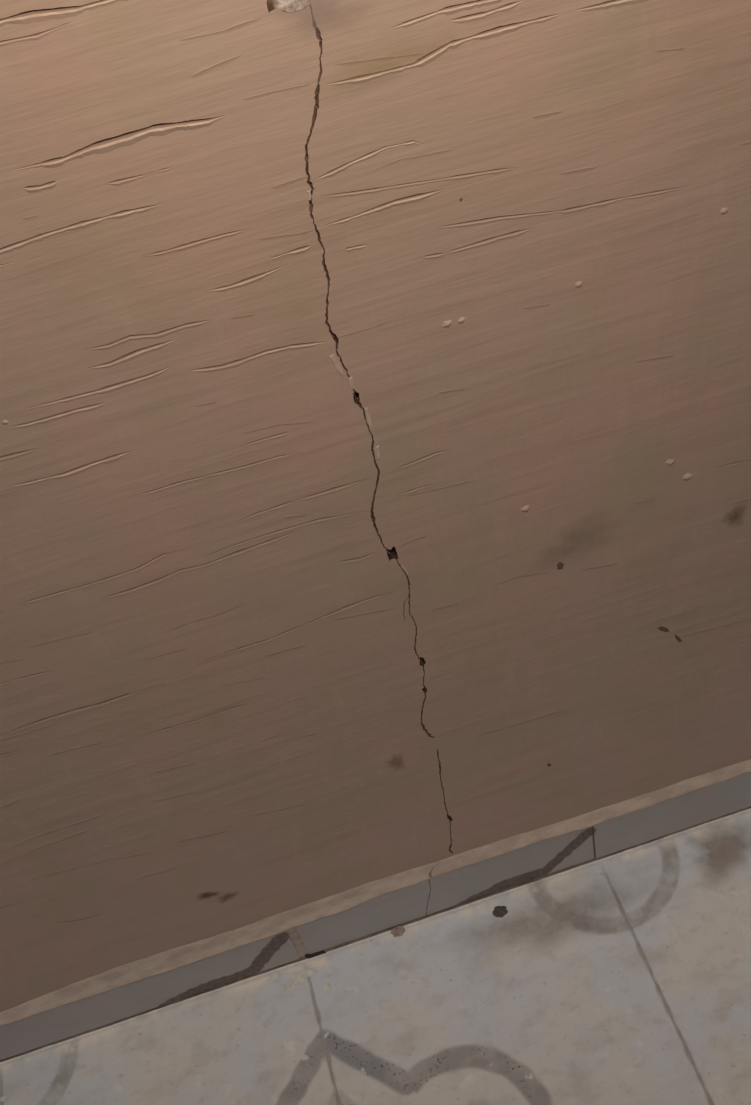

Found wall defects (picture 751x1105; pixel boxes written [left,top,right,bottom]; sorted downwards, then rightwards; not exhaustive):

crack [305,2,453,915]